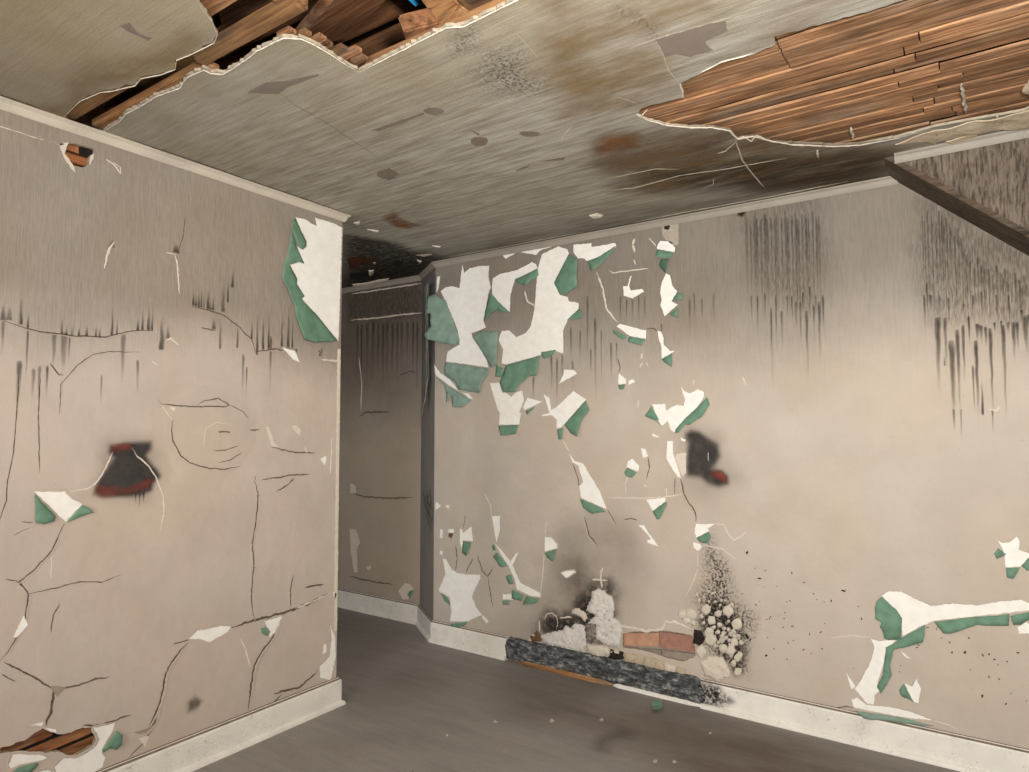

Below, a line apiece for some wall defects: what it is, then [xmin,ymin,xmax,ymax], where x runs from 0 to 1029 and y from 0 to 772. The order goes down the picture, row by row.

crack [0,321,179,519]
crack [71,448,166,533]
crack [158,398,229,419]
peeling [282,216,389,681]
peeling [420,242,618,525]
leakage [936,310,1027,375]
crack [0,523,121,726]
crack [129,425,333,758]
flaking render [528,588,696,674]
leakage [678,553,757,682]
peeling [833,589,1029,730]
spalling [0,715,130,772]